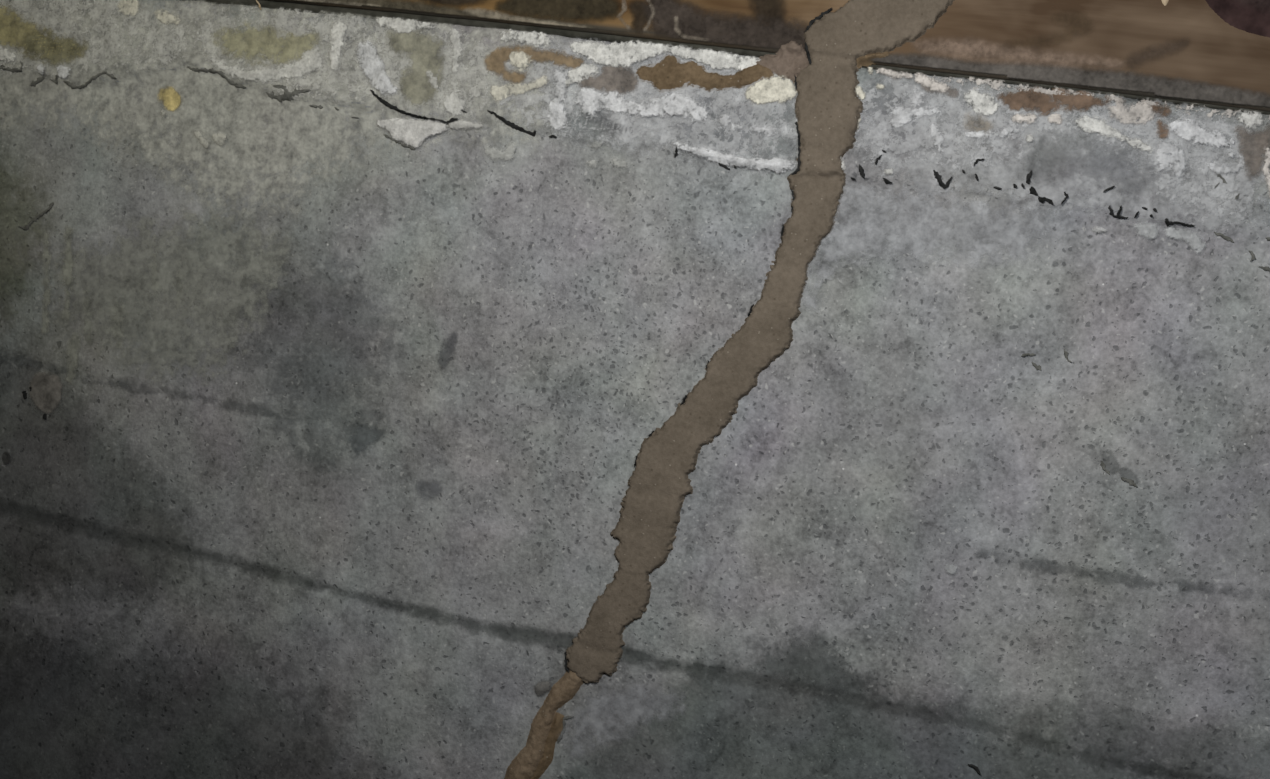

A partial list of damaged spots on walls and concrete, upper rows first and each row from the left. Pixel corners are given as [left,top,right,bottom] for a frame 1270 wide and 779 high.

damp [0,7,81,78]
damp [118,0,138,16]
damp [159,87,180,111]
damp [204,17,465,115]
damp [485,29,777,136]
damp [674,142,795,173]
damp [745,76,797,104]
damp [856,67,1270,191]
damp [0,362,186,595]
damp [0,640,366,779]